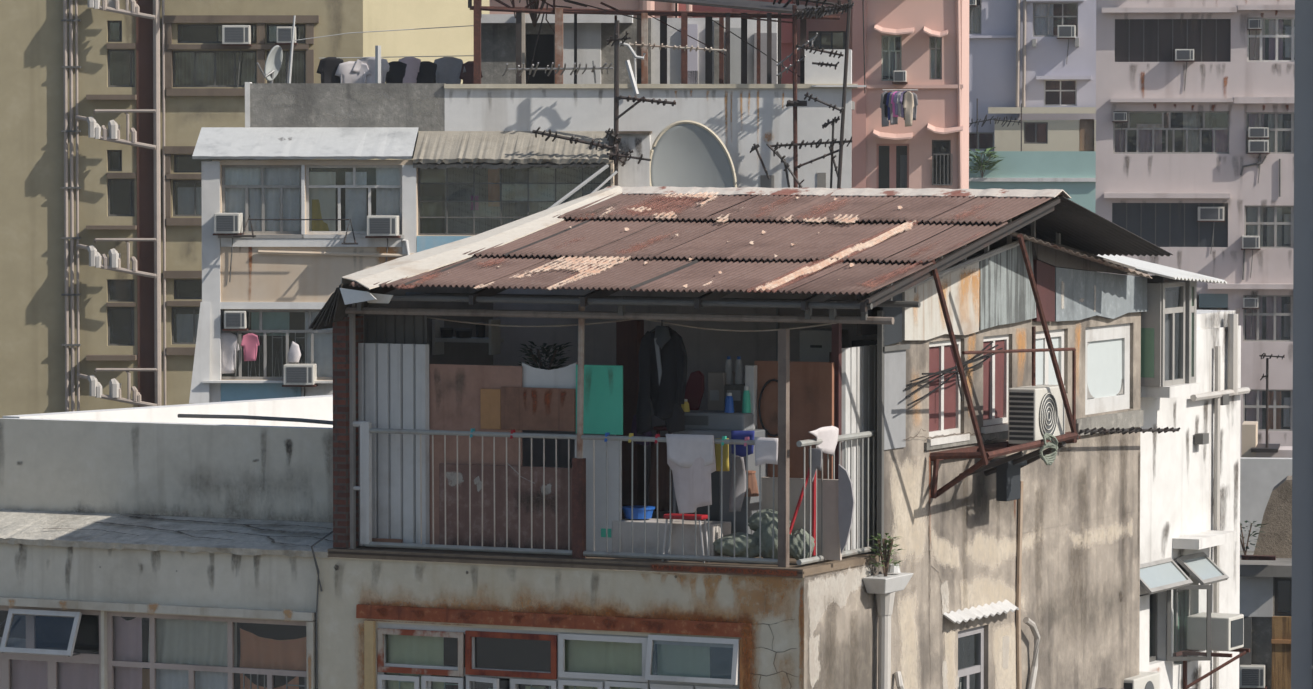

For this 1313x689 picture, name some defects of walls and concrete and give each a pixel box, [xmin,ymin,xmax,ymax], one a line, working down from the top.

corrosion [940,273,980,307]
damp [1187,402,1238,528]
corrosion [359,564,804,689]
crack [750,619,796,689]